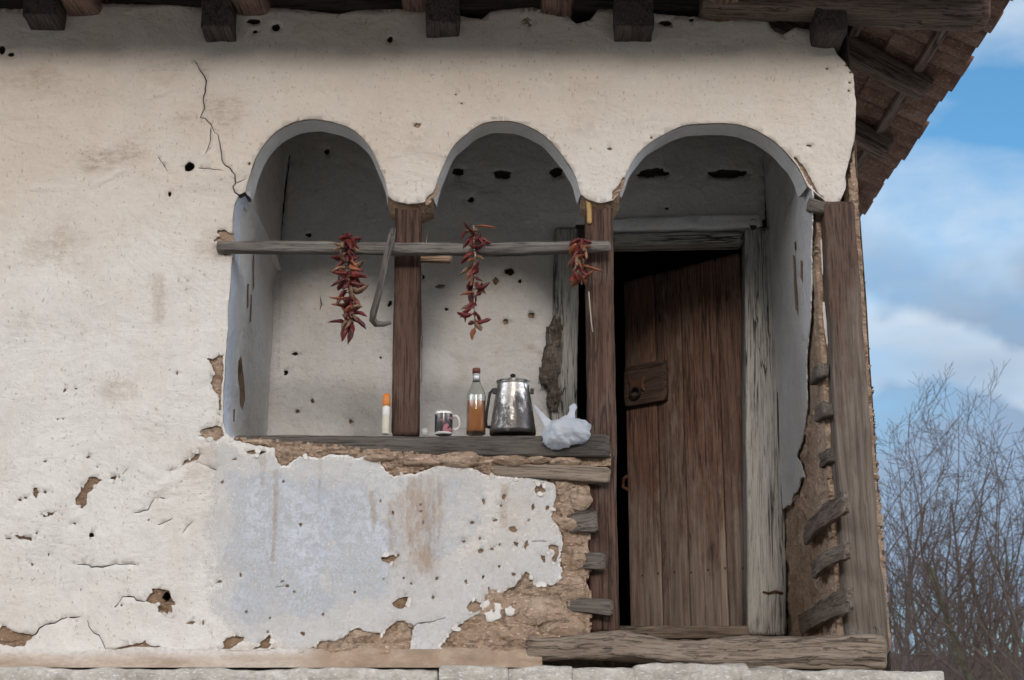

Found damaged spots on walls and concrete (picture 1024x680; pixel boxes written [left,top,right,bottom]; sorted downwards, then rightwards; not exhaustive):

crack [194,60,247,198]
spalling [183,352,245,465]
spalling [76,456,116,508]
spalling [527,480,556,522]
spalling [462,526,528,553]
spalling [541,544,561,564]
spalling [147,589,175,618]
spalling [392,577,413,609]
flaking render [466,576,515,622]
spalling [0,623,34,647]
crack [32,617,104,644]
spalling [213,617,275,652]